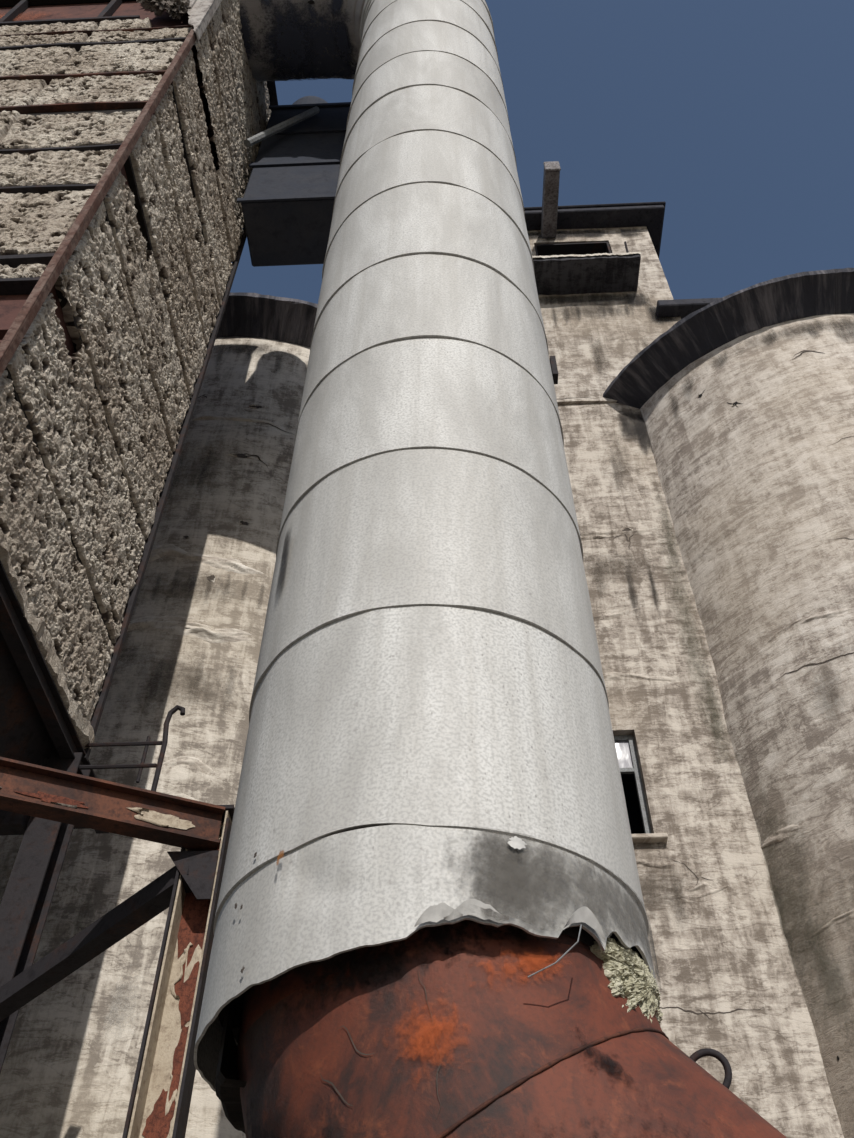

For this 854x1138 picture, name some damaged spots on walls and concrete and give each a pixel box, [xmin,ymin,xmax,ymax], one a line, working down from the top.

leakage [239,7,254,58]
leakage [636,418,651,451]
crack [775,652,854,681]
corrosion [0,787,89,809]
peeling [128,807,195,830]
peeling [142,892,211,1138]